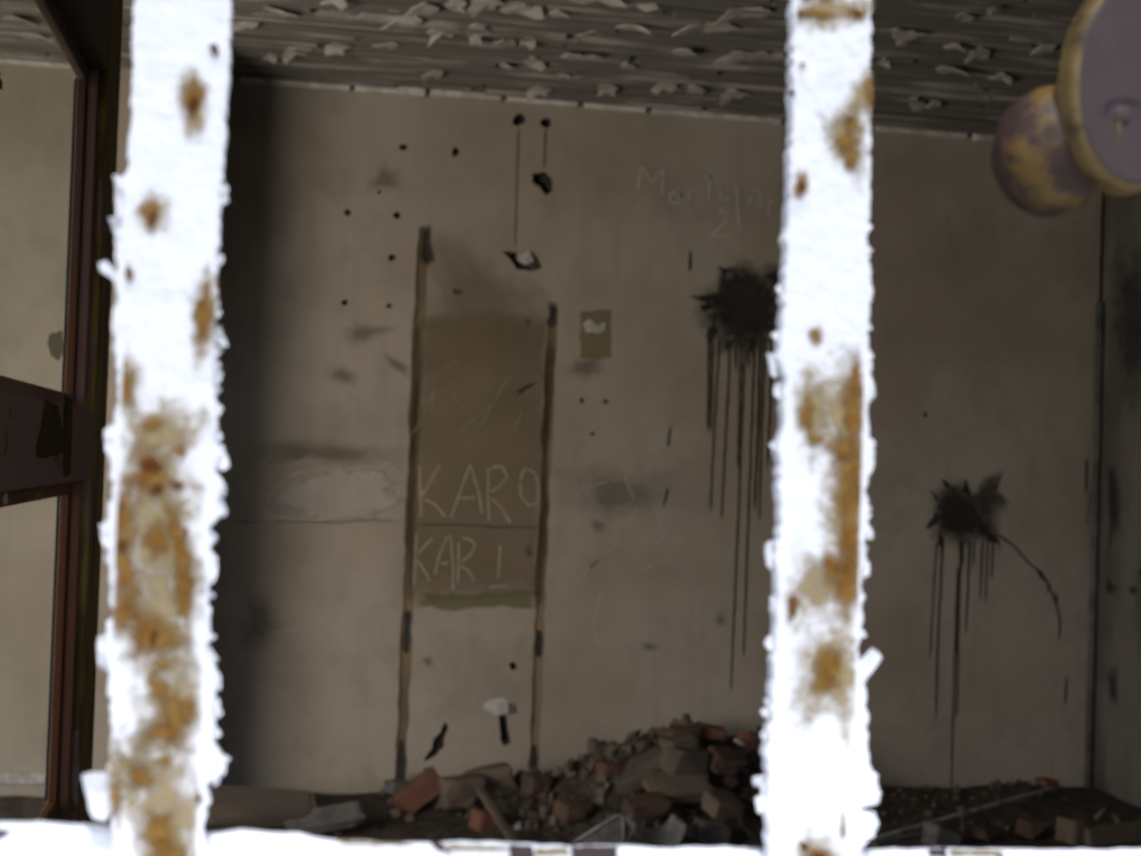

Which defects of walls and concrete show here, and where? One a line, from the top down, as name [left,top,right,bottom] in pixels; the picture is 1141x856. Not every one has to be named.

corrosion [181,76,206,135]
peeling [262,47,311,64]
peeling [320,0,659,102]
spalling [513,114,525,126]
peeling [672,7,773,56]
corrosion [827,74,873,173]
peeling [936,44,990,77]
corrosion [192,269,217,358]
leakage [692,267,780,689]
corrosion [788,358,864,722]
corrosion [109,359,208,856]
leakage [926,476,1061,788]